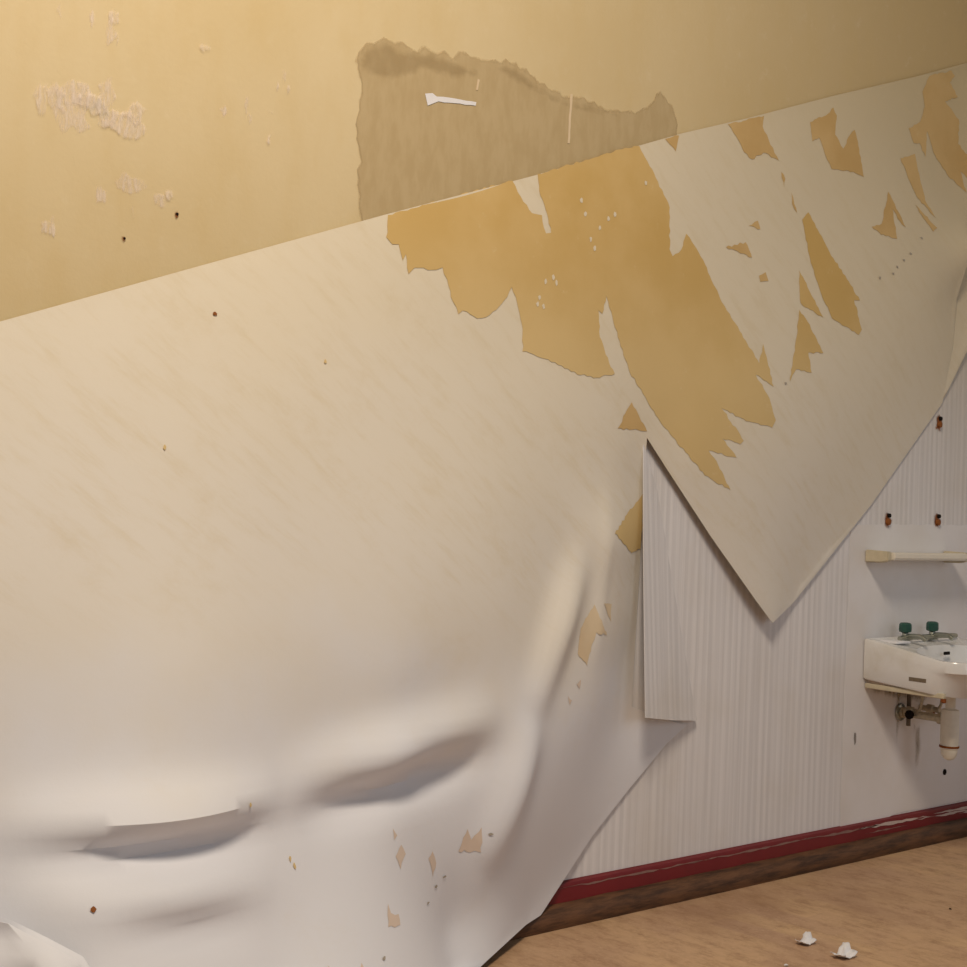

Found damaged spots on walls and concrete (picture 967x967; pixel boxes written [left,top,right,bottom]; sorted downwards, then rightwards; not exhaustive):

leakage [356,38,677,221]
peeling [561,806,967,889]